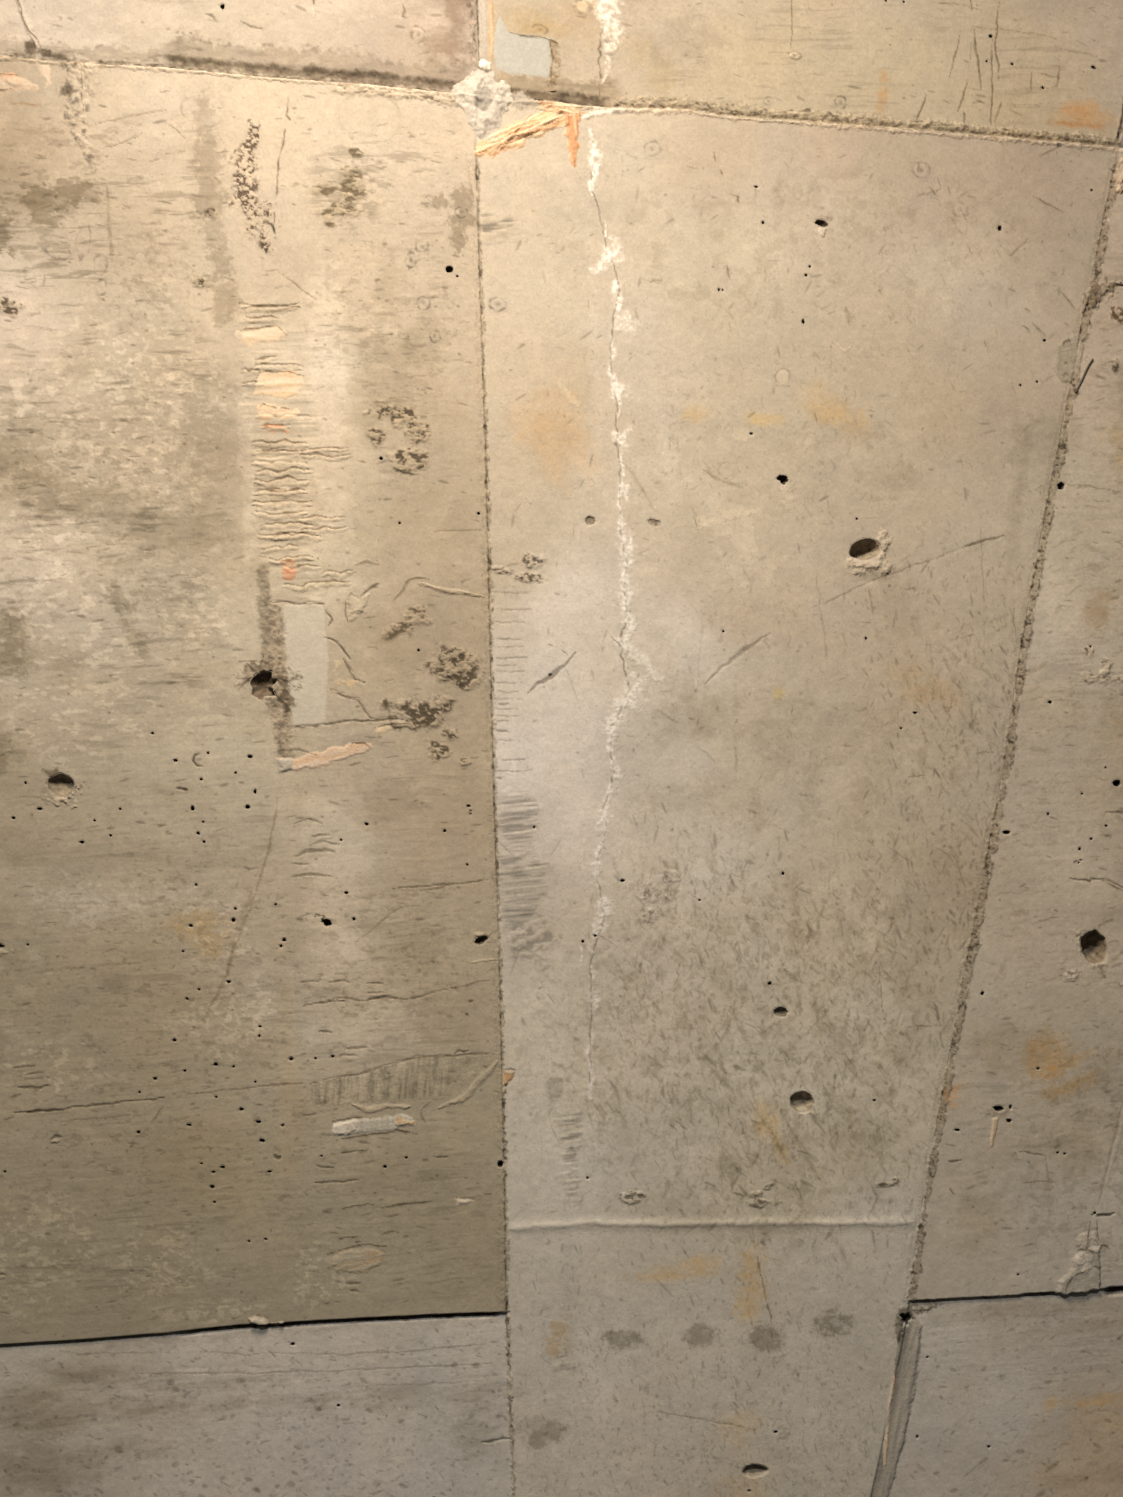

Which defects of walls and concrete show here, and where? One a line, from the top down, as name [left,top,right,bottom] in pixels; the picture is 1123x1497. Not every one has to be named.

crack [509,32,555,83]
crack [585,0,647,208]
water stain [475,140,679,943]
crack [601,596,666,784]
crack [579,898,620,1011]